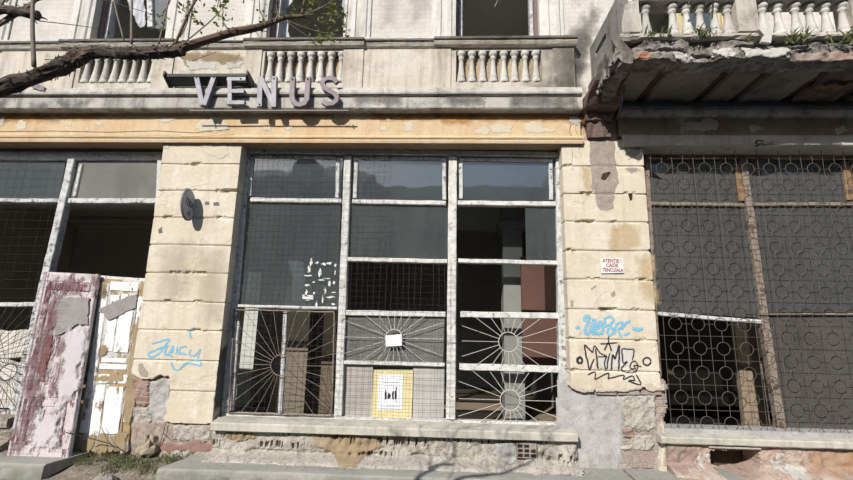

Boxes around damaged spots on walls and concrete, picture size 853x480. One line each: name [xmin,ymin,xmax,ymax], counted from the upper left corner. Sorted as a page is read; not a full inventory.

flaking render [711,47,853,61]
peeling [186,60,216,70]
peeling [474,123,513,135]
peeling [523,121,554,133]
peeling [584,132,619,211]
flaking render [125,363,221,459]
flaking render [555,373,668,470]
flaking render [226,432,255,442]
flaking render [311,435,383,468]